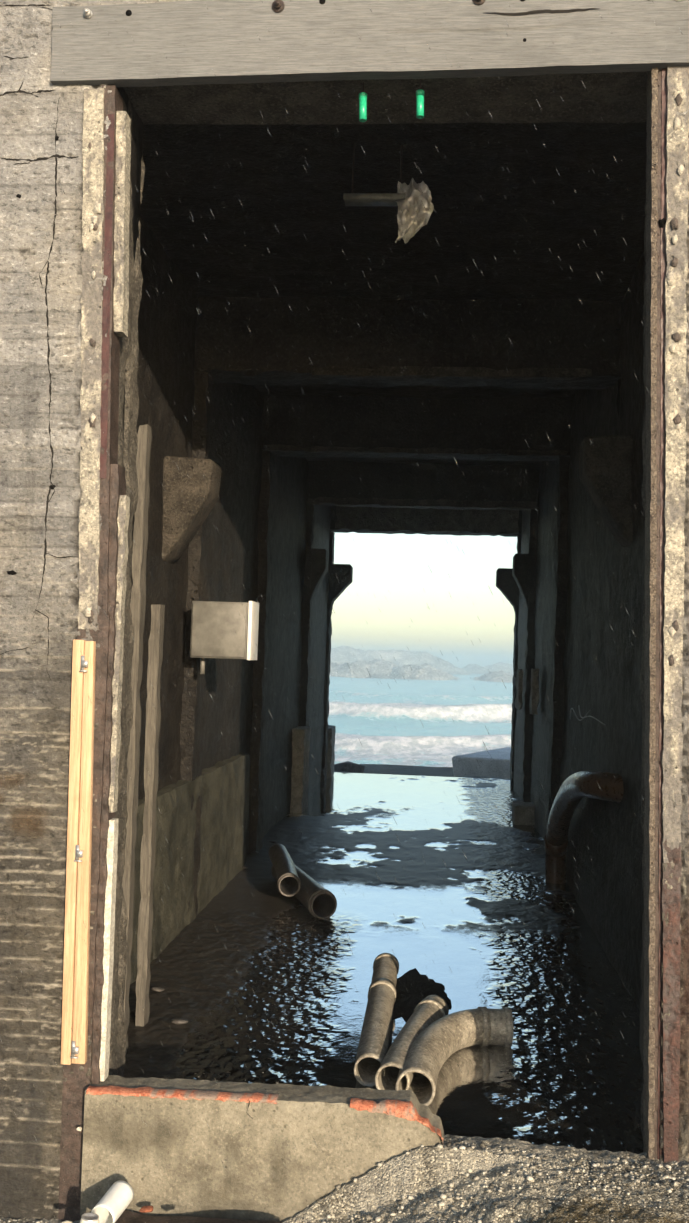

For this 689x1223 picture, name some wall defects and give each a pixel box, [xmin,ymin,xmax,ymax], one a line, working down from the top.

crack [0,56,79,680]